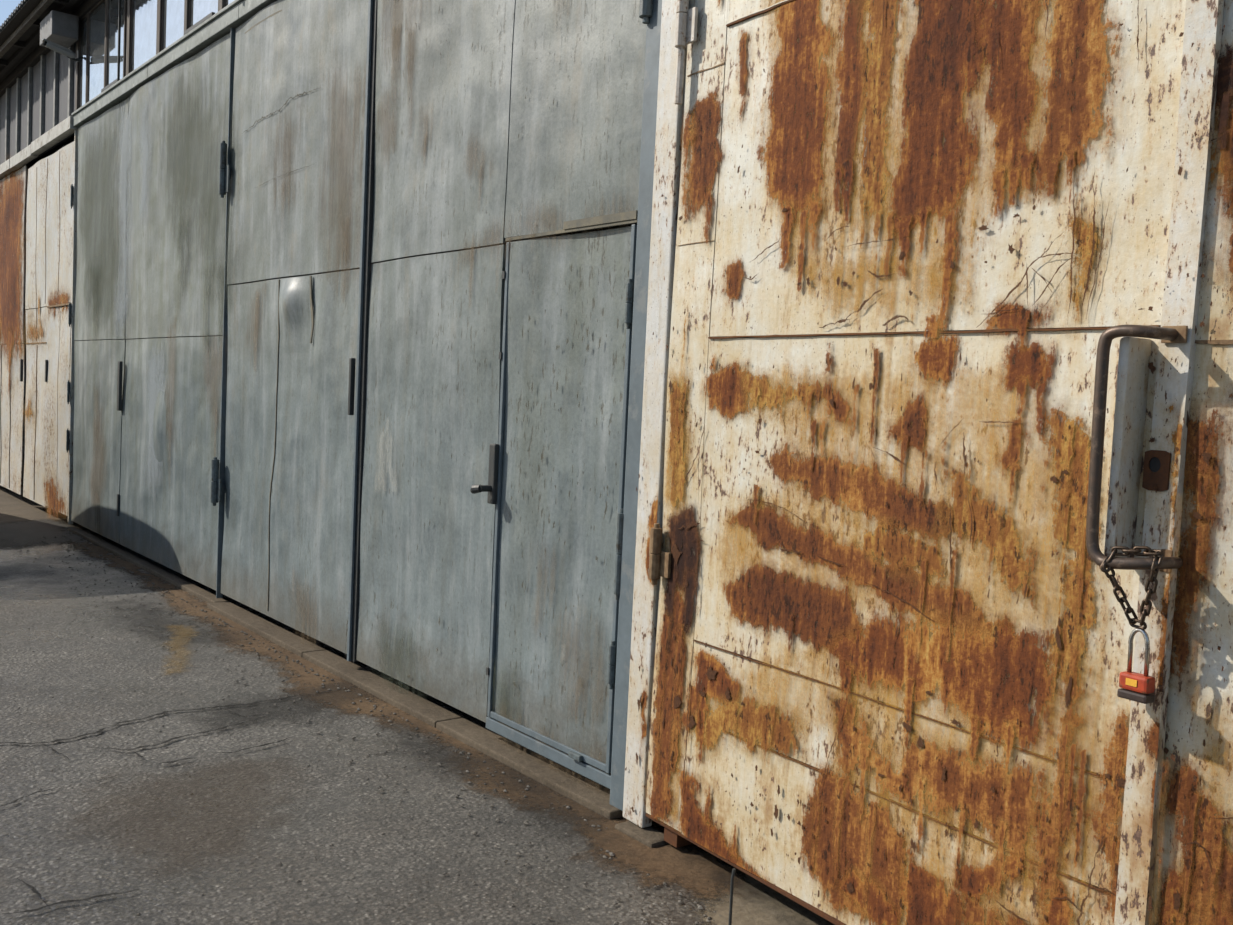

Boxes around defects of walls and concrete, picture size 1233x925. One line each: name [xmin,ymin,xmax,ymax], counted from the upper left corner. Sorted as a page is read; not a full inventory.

rust [1208,50,1233,273]
rust [0,169,69,390]
rust [44,476,66,517]
rust [641,0,1129,925]
rust [1157,405,1231,685]
rust [1147,722,1233,925]